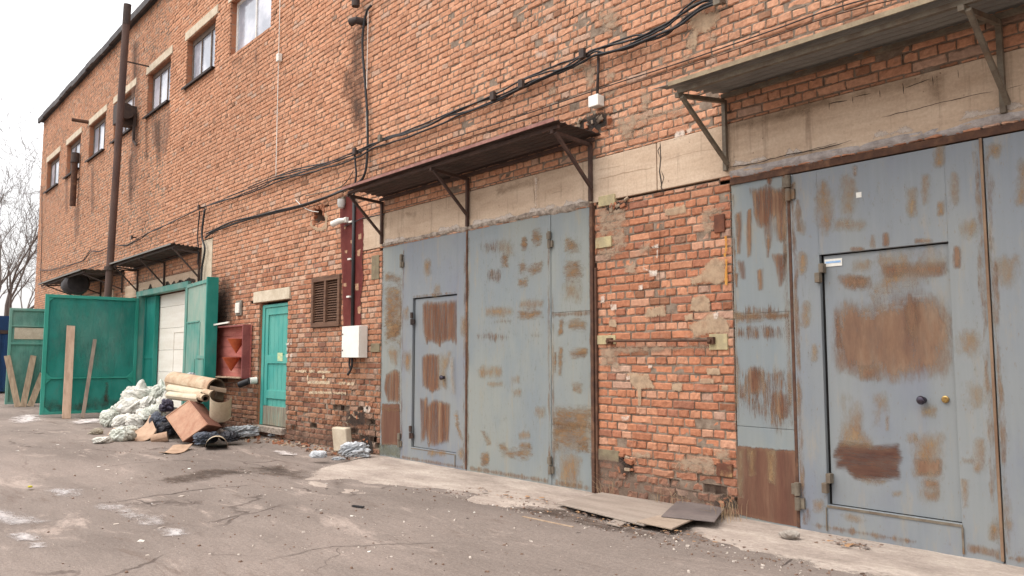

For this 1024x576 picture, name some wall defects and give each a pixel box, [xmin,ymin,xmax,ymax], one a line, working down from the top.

crack [596,144,712,202]
crack [732,140,851,167]
crack [655,234,663,332]
rust [733,201,808,406]
rust [835,233,960,380]
rust [379,274,410,458]
rust [420,281,539,464]
rust [736,446,805,526]
rust [834,419,901,481]